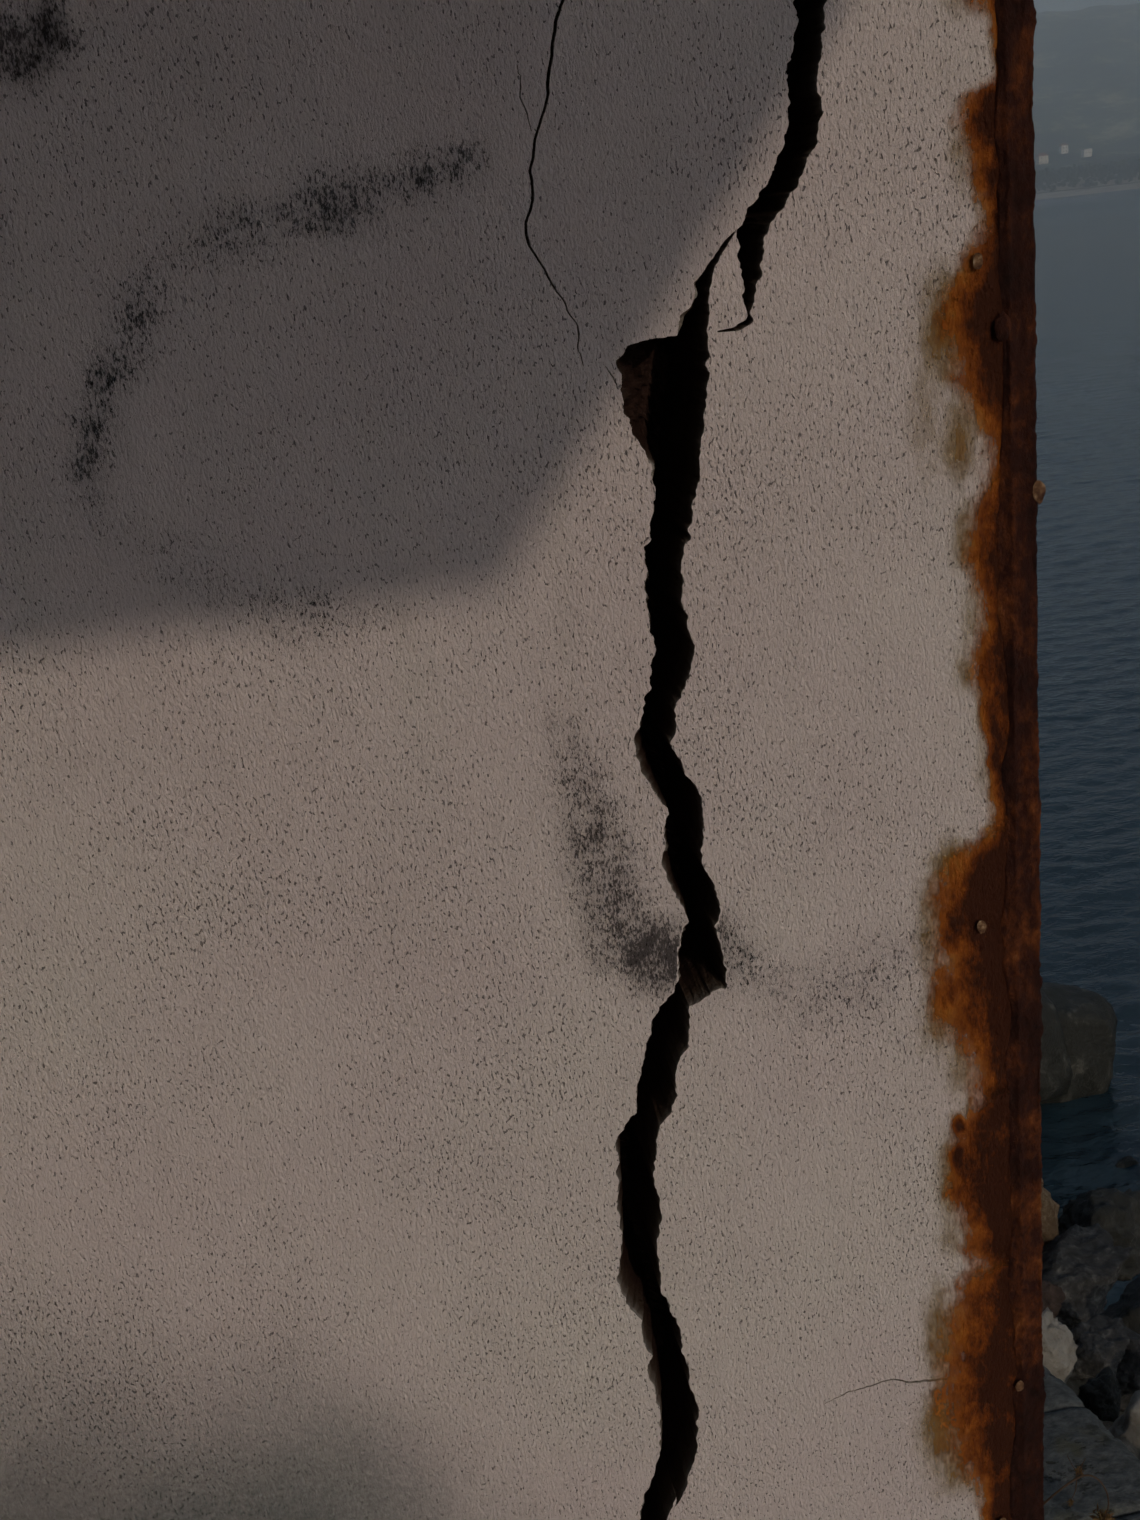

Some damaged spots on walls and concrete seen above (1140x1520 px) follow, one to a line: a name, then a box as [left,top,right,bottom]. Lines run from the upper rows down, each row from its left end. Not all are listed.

corrosion [967,0,998,53]
crack [517,0,827,1520]
corrosion [923,73,1018,1520]